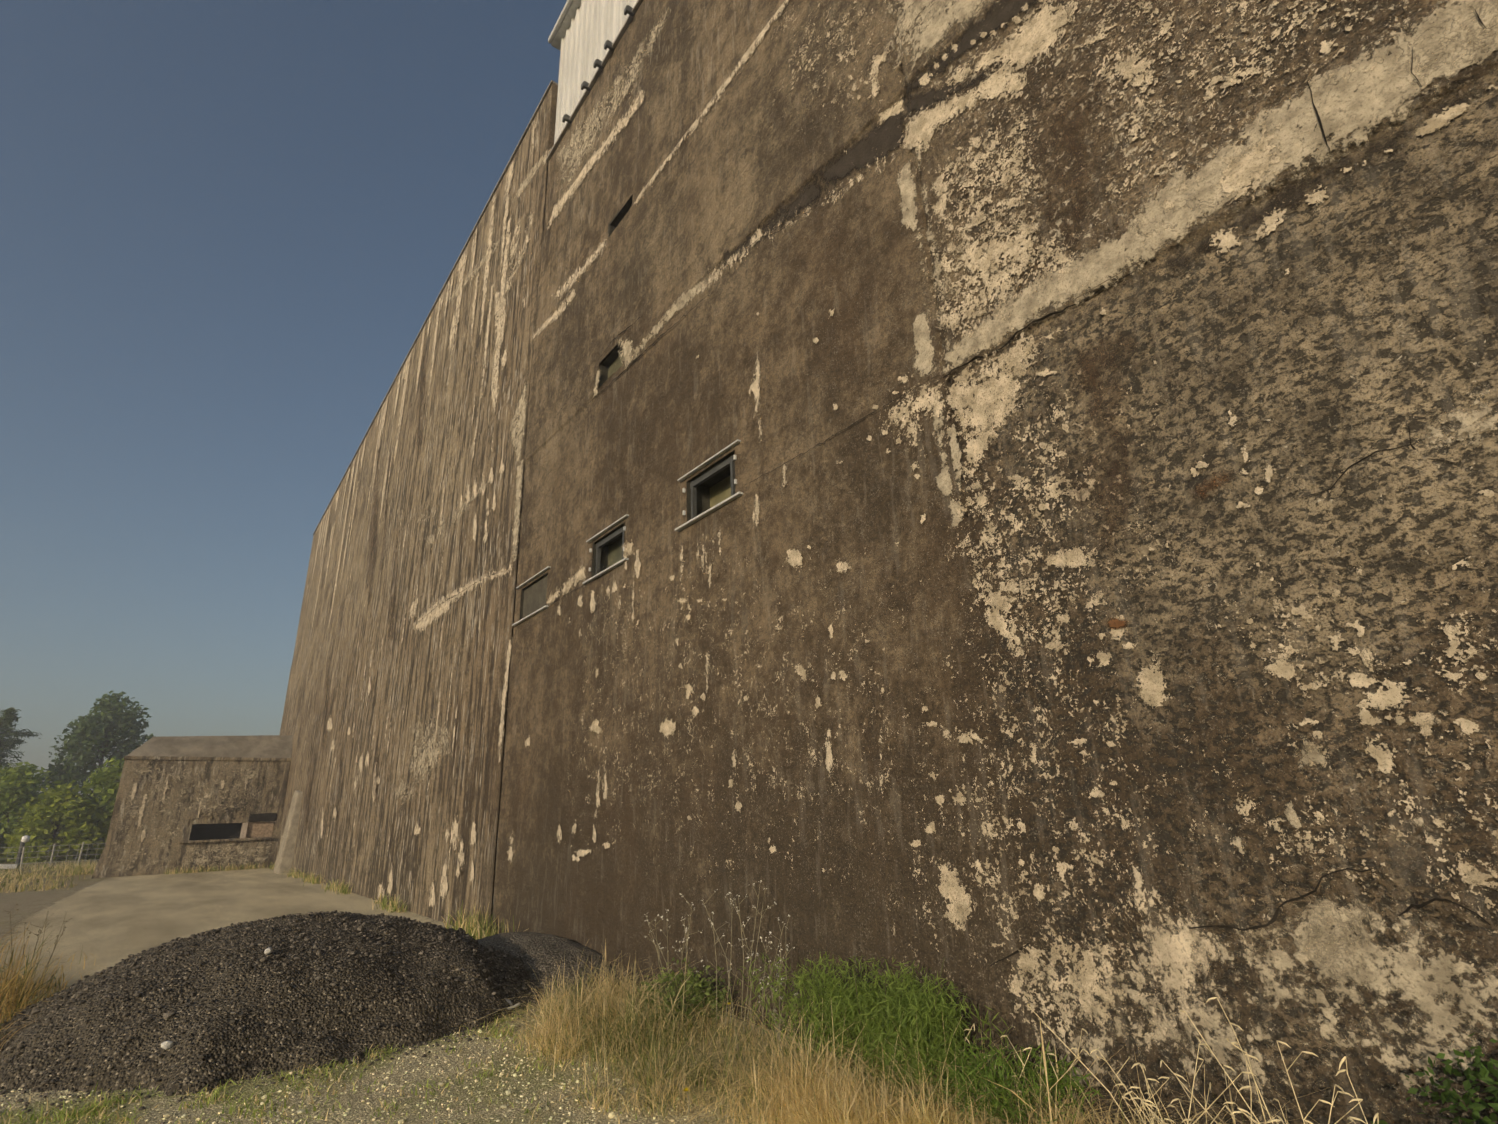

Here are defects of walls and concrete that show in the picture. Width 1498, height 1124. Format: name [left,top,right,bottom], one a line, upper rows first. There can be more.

leakage [1429,94,1468,118]
leakage [701,0,1036,294]
leakage [1235,159,1350,231]
leakage [1167,235,1219,270]
leakage [1072,338,1128,544]
crack [1189,868,1372,930]
crack [1398,898,1491,925]
crack [990,943,1029,966]
leakage [1103,844,1273,1052]